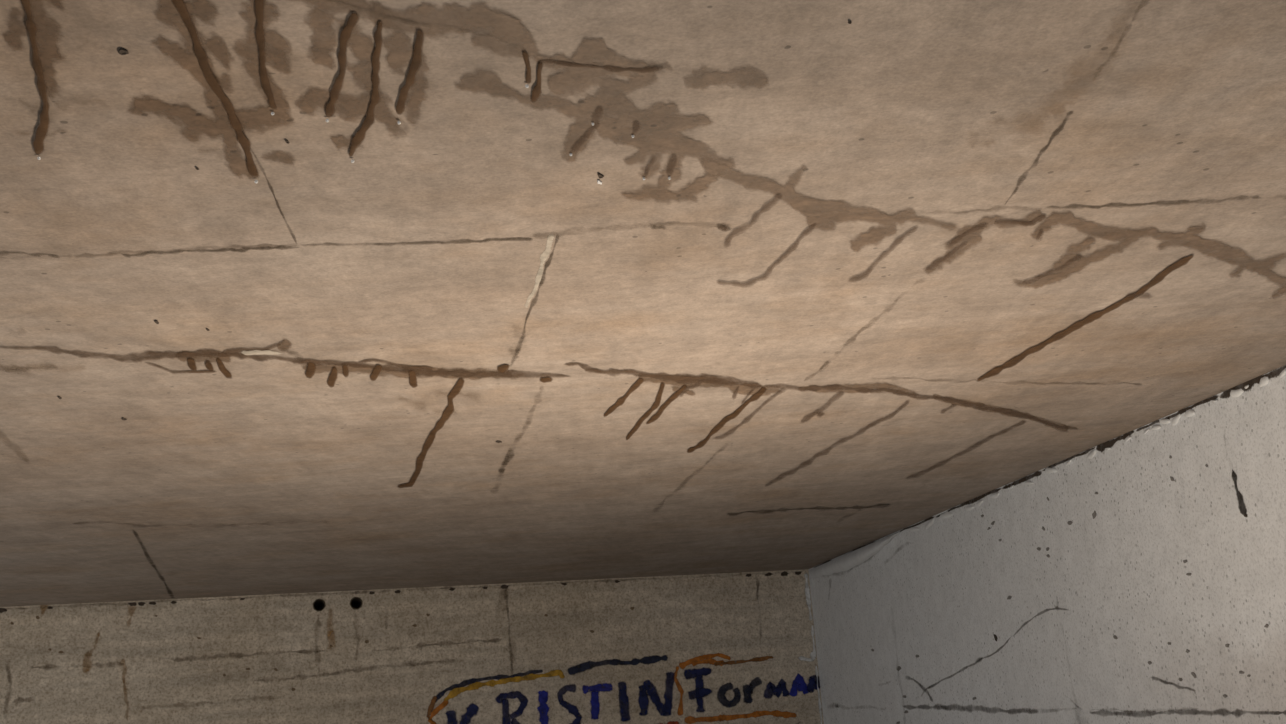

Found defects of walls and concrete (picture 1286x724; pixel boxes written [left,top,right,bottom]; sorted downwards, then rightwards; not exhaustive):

damp [4,0,63,160]
damp [130,0,1286,381]
crack [896,606,1067,724]
crack [1091,677,1286,717]